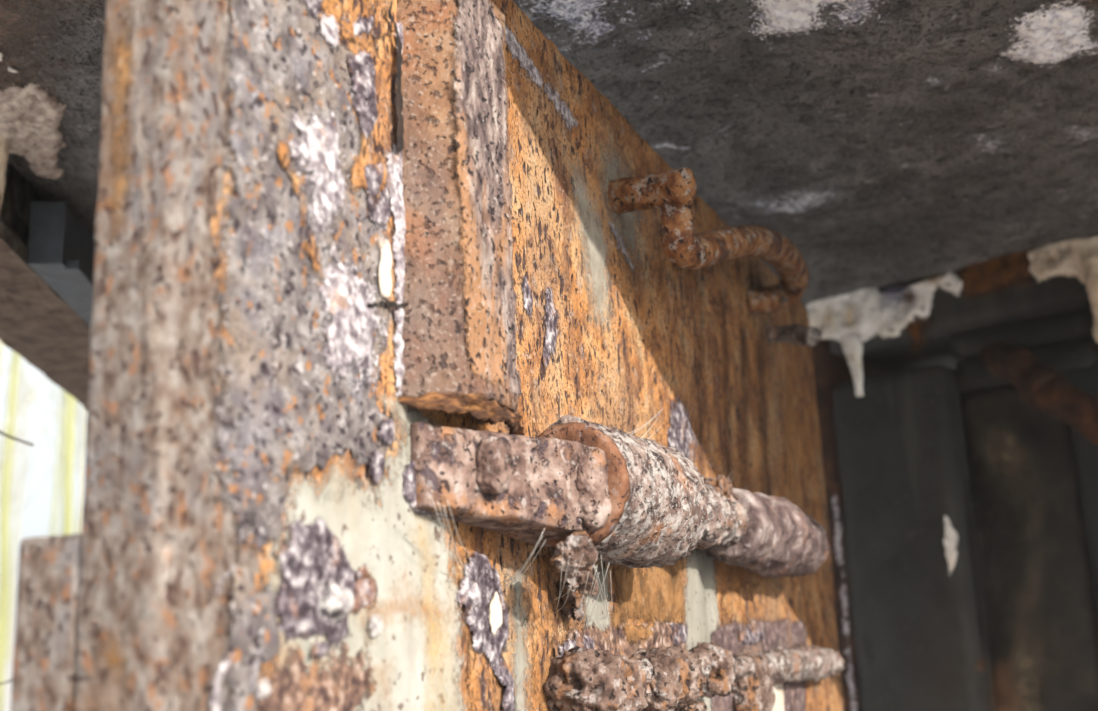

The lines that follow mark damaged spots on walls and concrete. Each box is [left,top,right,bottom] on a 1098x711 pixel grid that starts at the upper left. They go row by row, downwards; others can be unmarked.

rust [322,0,394,49]
water stain [515,0,691,56]
water stain [749,0,881,40]
water stain [994,0,1098,74]
rust [351,133,387,204]
rust [277,141,323,276]
water stain [1028,234,1098,283]
water stain [806,271,963,343]
rust [453,550,500,711]
rust [522,547,555,711]
rust [613,558,686,630]
rust [721,582,765,625]